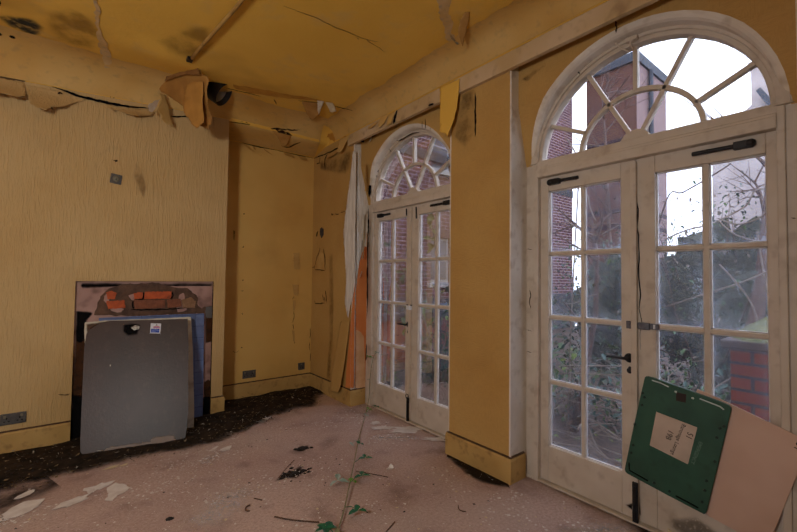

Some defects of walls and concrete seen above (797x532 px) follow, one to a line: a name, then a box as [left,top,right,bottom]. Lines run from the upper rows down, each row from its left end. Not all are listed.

leakage [1,17,40,34]
crack [287,7,383,51]
crack [52,86,149,109]
peeling [317,100,336,113]